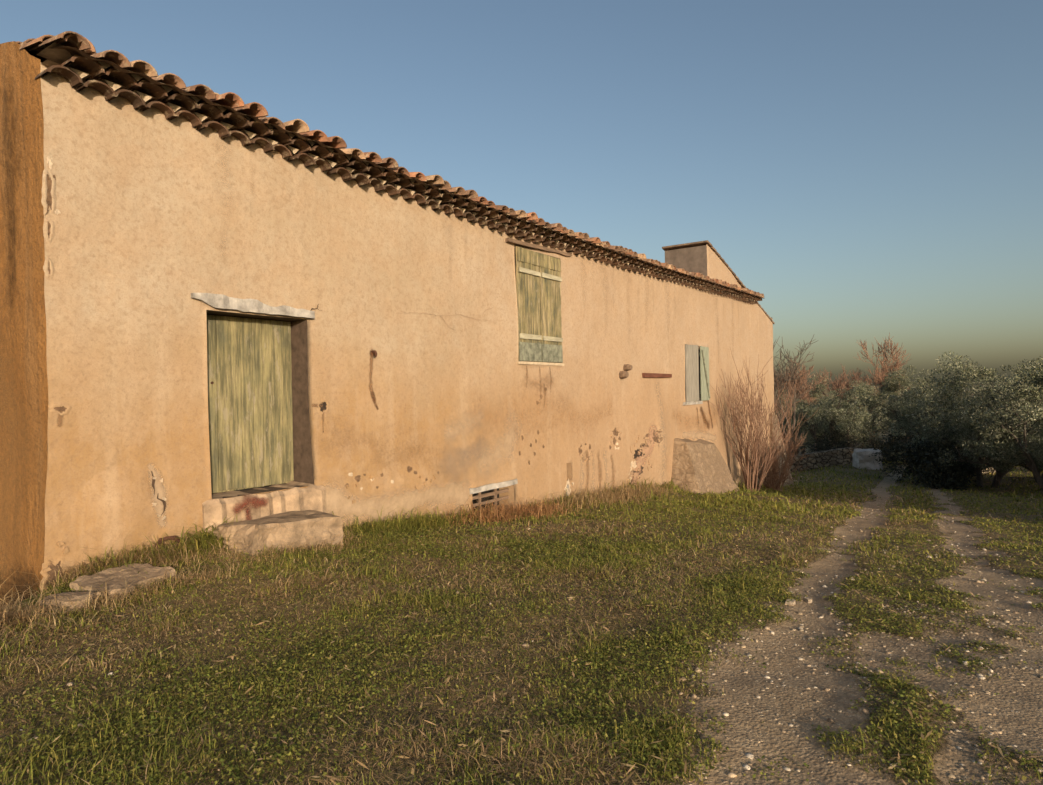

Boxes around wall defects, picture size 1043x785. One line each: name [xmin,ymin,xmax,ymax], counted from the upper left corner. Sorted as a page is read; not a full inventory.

corrosion [369,350,378,410]
spalling [564,425,664,496]
peeling [148,465,166,526]
peeling [325,466,470,522]